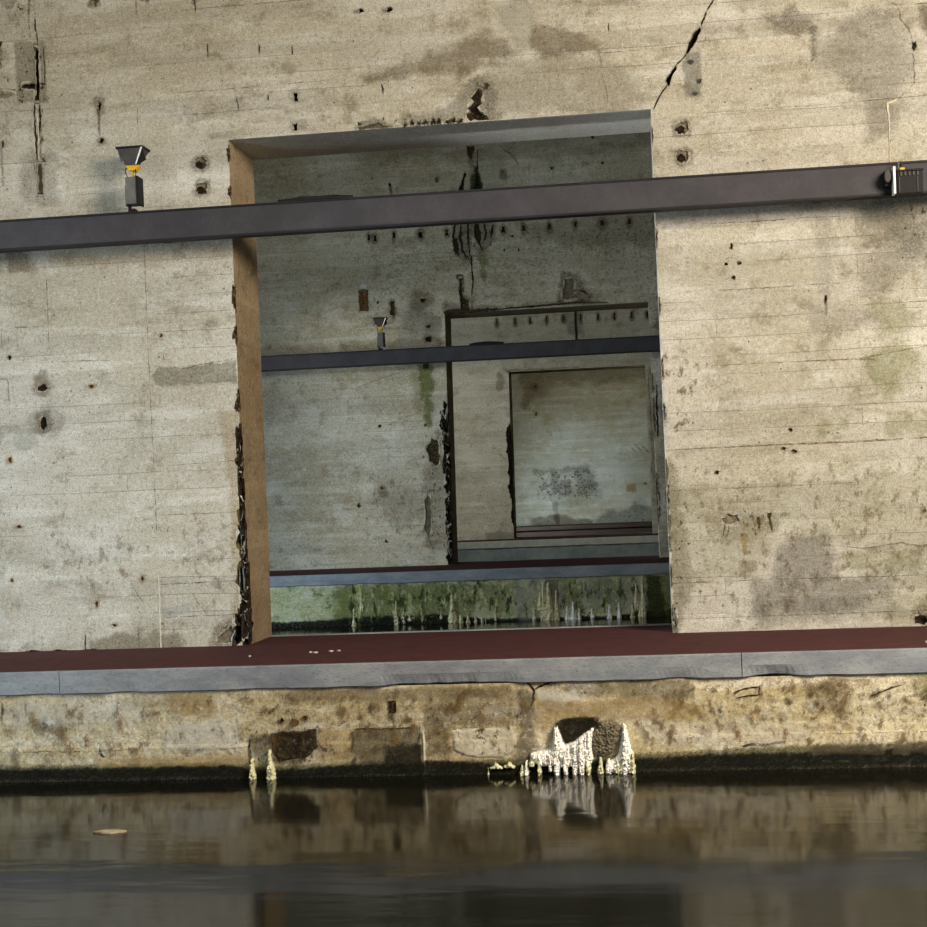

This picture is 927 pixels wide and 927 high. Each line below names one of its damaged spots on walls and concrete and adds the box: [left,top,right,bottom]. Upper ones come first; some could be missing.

crack [653,0,714,110]
spalling [355,80,498,131]
leakage [418,363,434,427]
spalling [214,388,254,646]
spalling [423,399,453,565]
spalling [246,716,318,767]
spalling [351,726,422,768]
leakage [4,684,788,780]